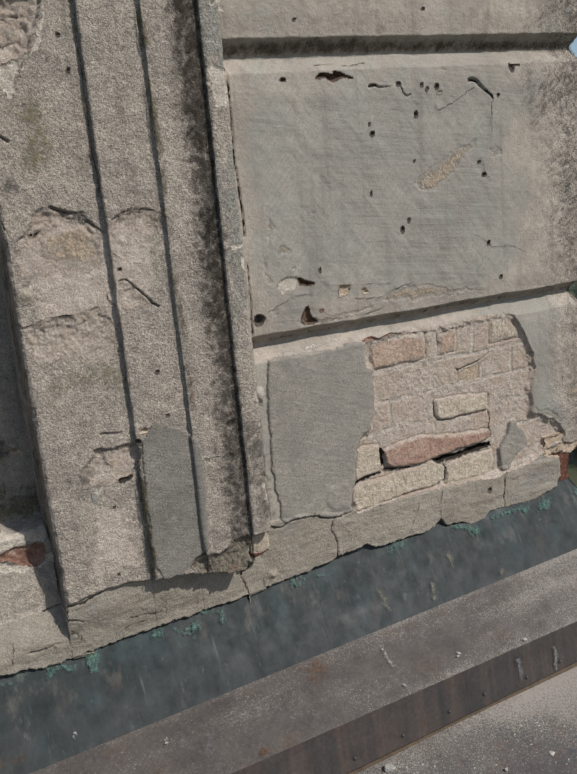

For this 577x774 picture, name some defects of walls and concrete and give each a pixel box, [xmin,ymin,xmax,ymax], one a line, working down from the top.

spalling [0,0,45,100]
damp [136,11,150,46]
damp [146,78,165,153]
damp [164,0,224,183]
crack [438,80,493,132]
peeling [13,205,163,369]
damp [194,200,239,372]
spalling [302,306,324,325]
spalling [351,312,577,514]
peeling [0,524,55,575]
crack [272,512,352,556]